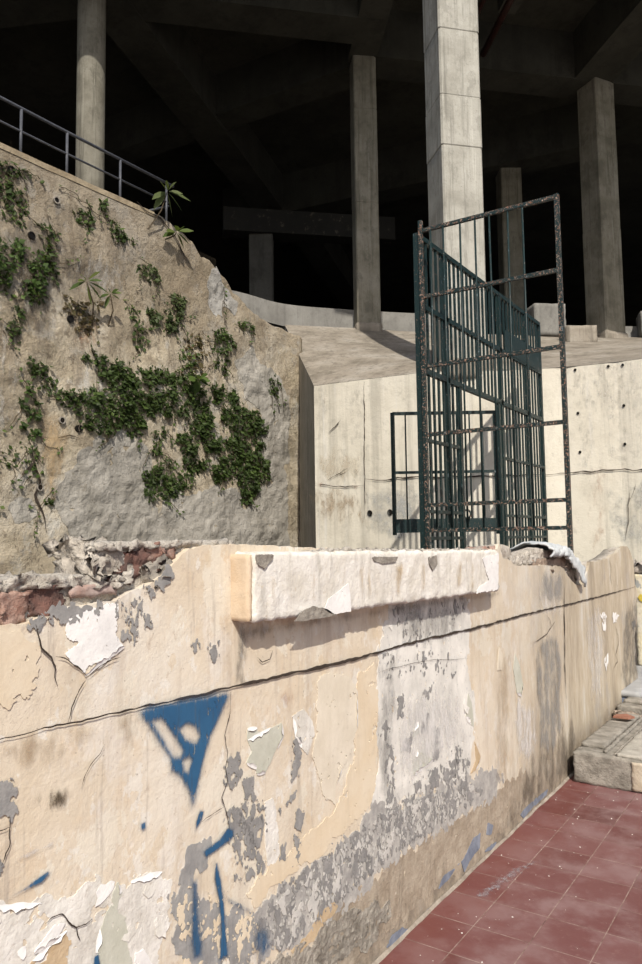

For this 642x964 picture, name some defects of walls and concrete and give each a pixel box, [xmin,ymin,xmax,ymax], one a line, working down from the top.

spalling [8,496,37,524]
peeling [0,553,548,964]
crack [0,561,633,828]
leakage [537,639,573,773]